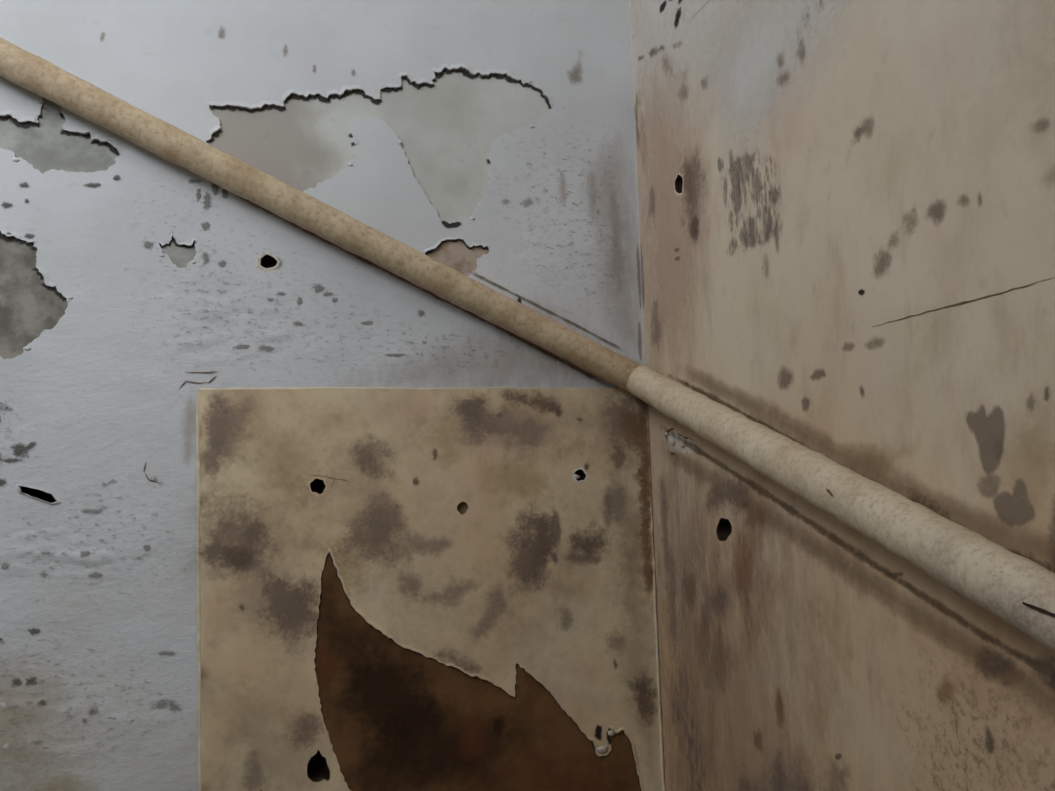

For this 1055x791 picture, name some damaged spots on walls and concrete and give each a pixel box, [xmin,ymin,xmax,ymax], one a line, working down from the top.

peeling [0,97,122,187]
peeling [189,179,228,209]
peeling [206,63,555,276]
peeling [0,182,73,359]
peeling [144,222,239,328]
crack [873,277,1055,327]
peeling [0,436,35,462]
water stain [967,406,1004,473]
water stain [207,517,261,571]
water stain [511,512,603,588]
water stain [605,400,694,639]
water stain [994,480,1034,524]